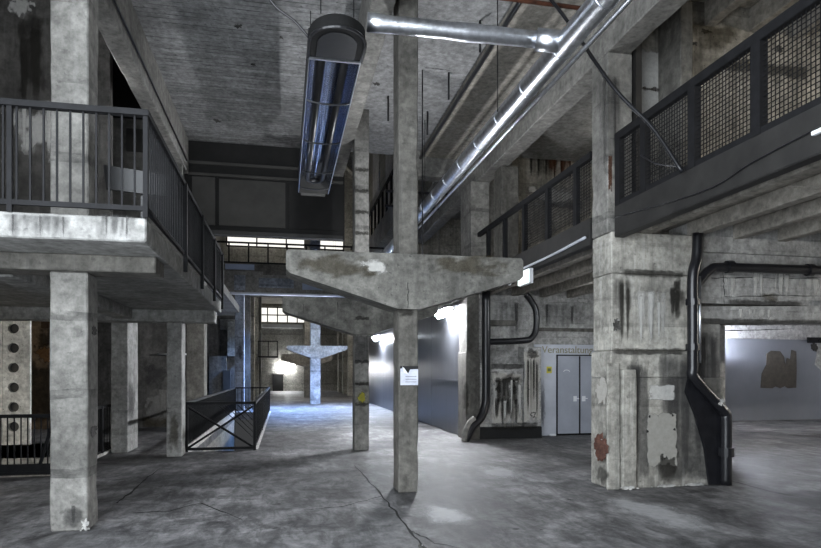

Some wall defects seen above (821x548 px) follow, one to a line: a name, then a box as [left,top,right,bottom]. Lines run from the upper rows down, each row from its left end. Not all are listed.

crack [310,465,458,548]